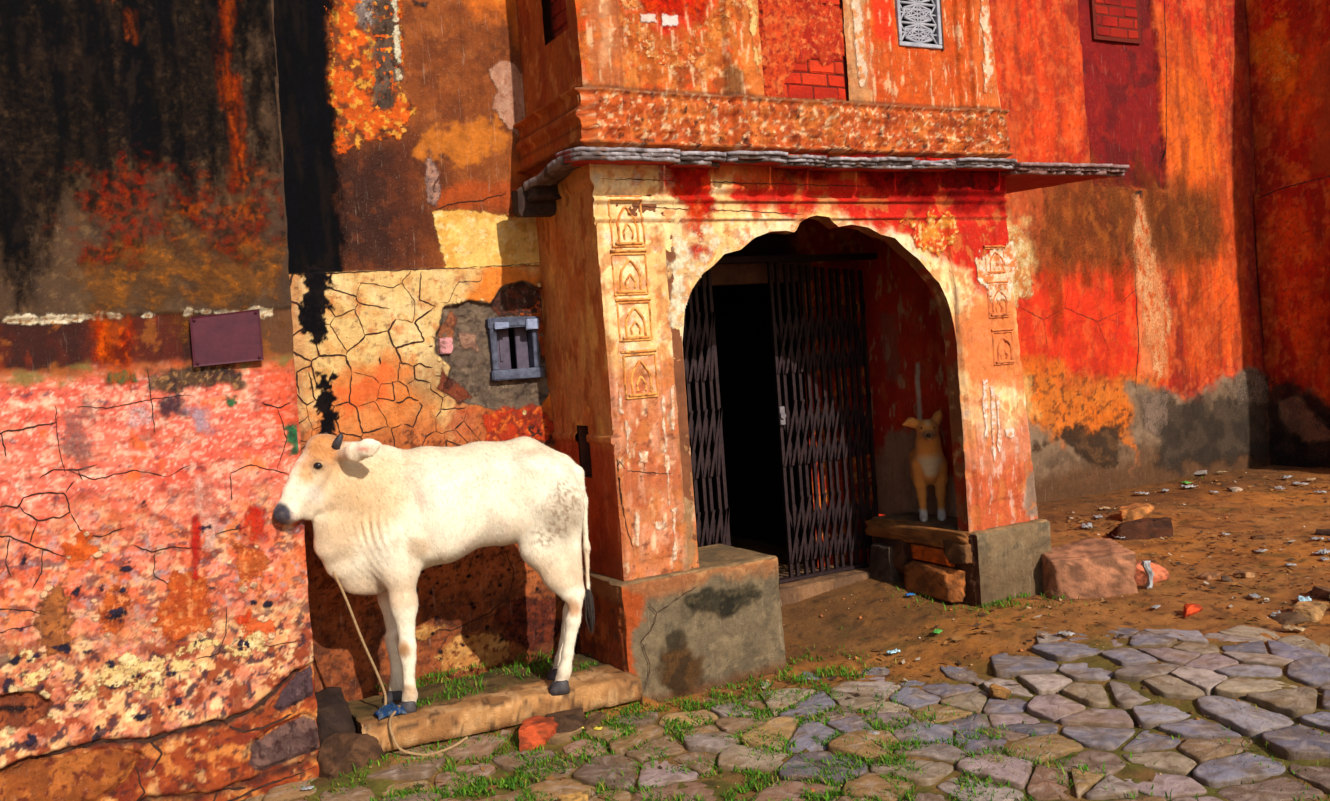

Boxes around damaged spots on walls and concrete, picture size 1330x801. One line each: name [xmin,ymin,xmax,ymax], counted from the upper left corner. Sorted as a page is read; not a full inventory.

leakage [0,0,345,344]
crack [0,262,540,633]
leakage [310,371,340,434]
flaking render [425,158,550,415]
leakage [685,584,762,617]
leakage [1033,159,1330,475]